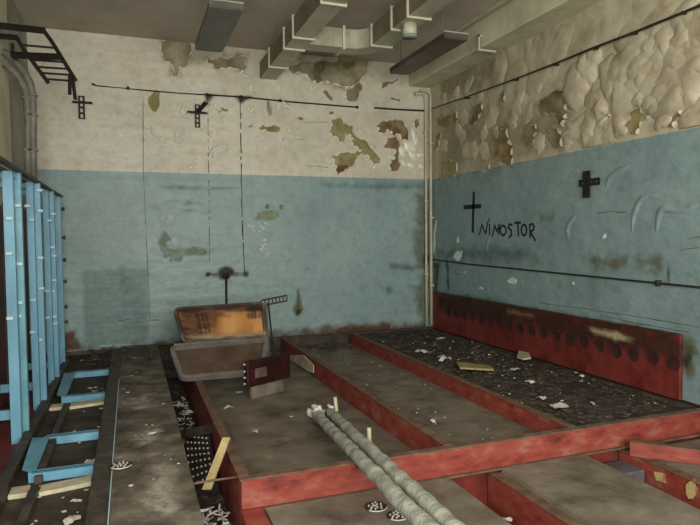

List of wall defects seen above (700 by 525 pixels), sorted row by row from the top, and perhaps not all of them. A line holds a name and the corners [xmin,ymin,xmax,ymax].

peeling [160,40,192,78]
peeling [206,54,248,70]
peeling [289,58,369,103]
peeling [328,111,381,176]
peeling [376,117,420,173]
peeling [158,231,208,263]
peeling [247,204,284,256]